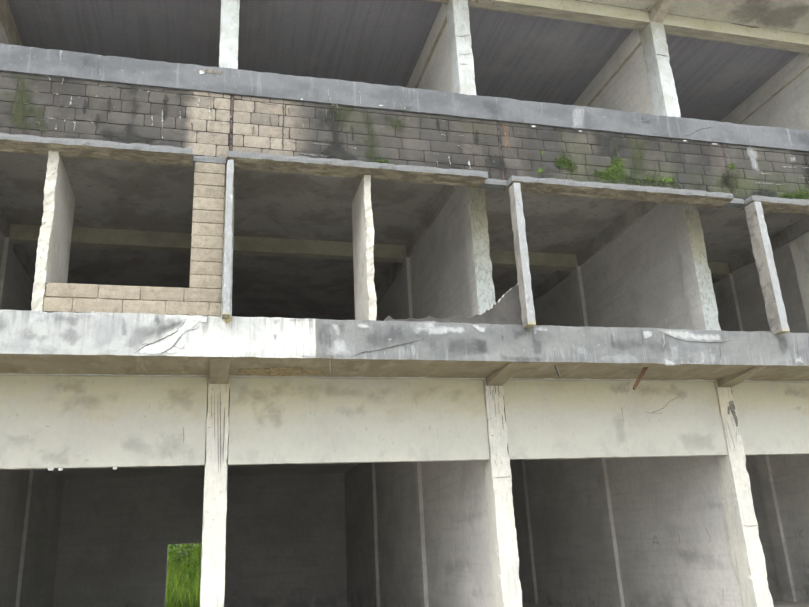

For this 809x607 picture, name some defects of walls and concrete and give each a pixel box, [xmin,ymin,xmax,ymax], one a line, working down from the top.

damp [91,113,151,142]
spalling [139,317,207,354]
crack [351,340,420,357]
spalling [728,401,739,433]